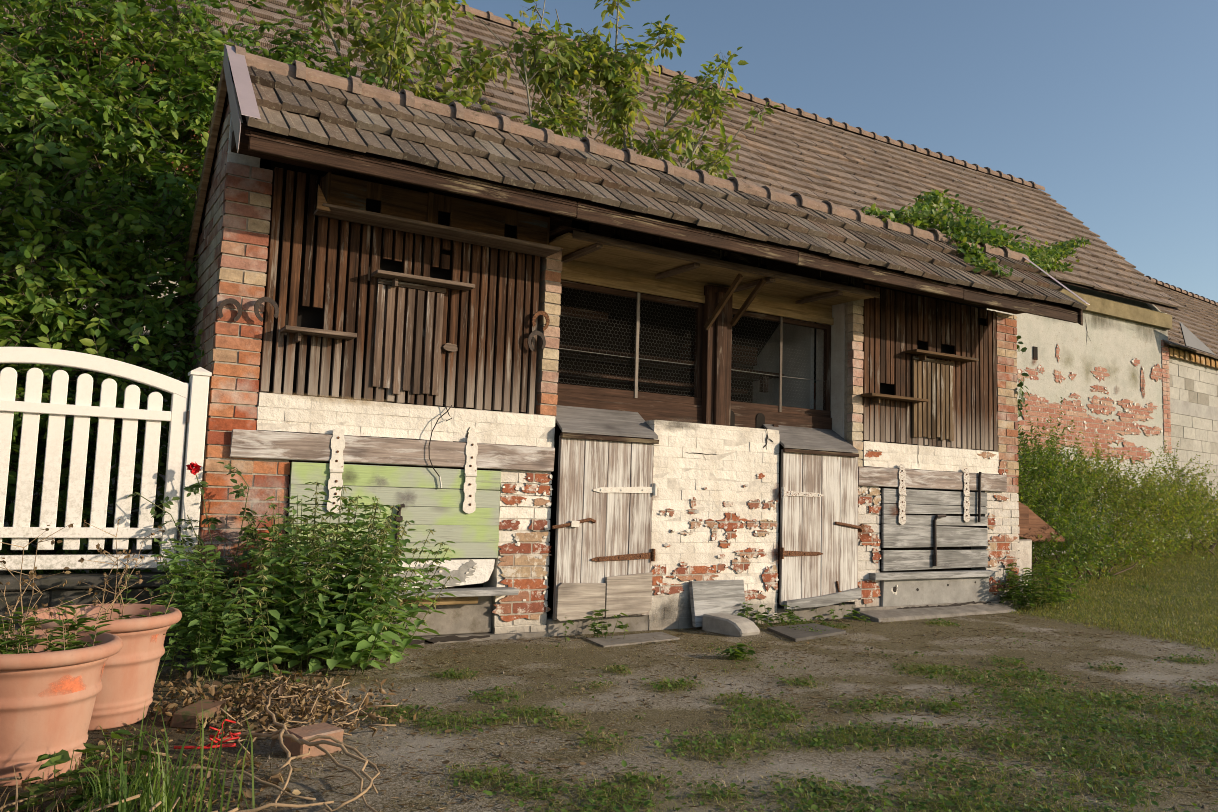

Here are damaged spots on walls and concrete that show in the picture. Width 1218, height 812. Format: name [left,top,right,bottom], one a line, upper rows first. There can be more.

flaking render [1017,344,1163,464]
peeling [492,472,553,622]
peeling [651,473,779,601]
peeling [858,486,882,563]
peeling [858,579,898,604]
peeling [986,495,1020,595]